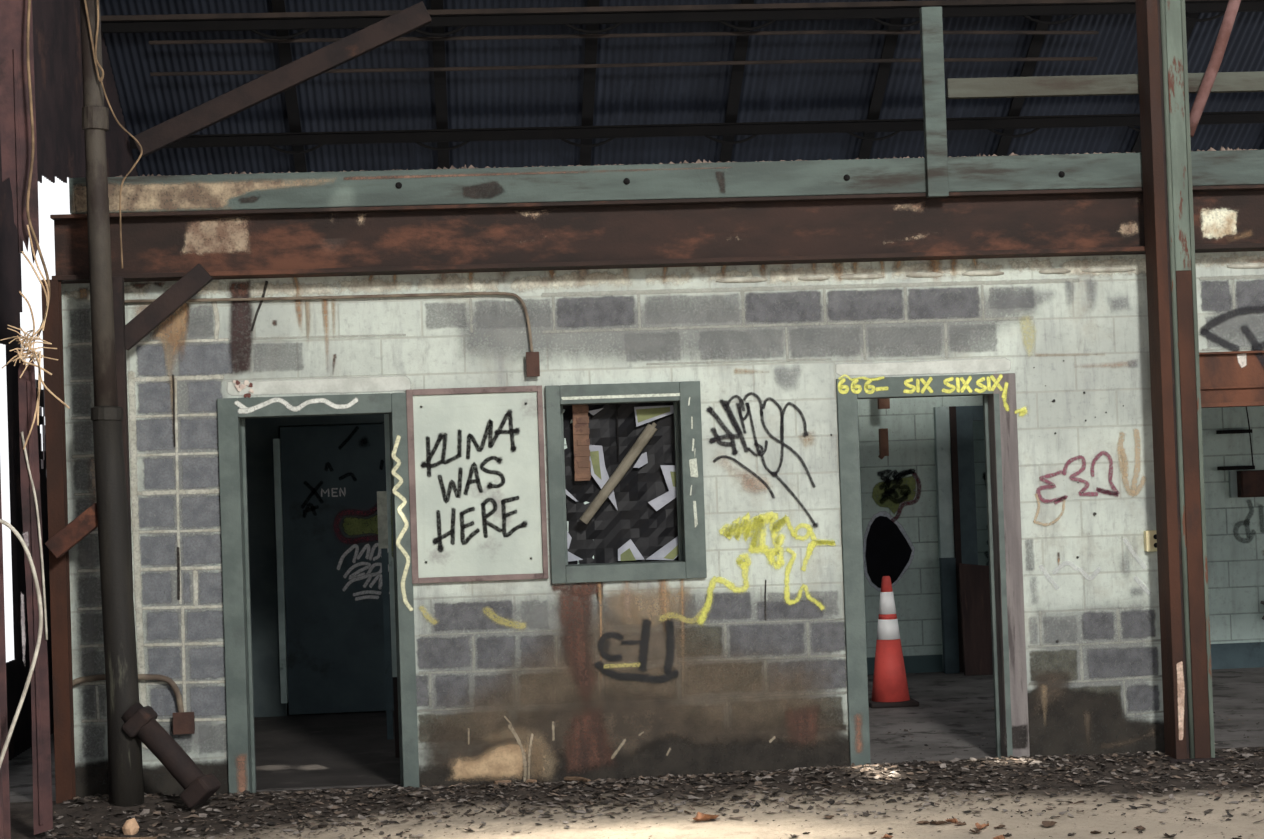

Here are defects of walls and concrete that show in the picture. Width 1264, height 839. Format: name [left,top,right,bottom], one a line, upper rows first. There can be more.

peeling [183,217,249,255]
peeling [1201,208,1249,239]
corrosion [229,281,252,373]
corrosion [552,582,603,696]
leakage [419,617,850,787]